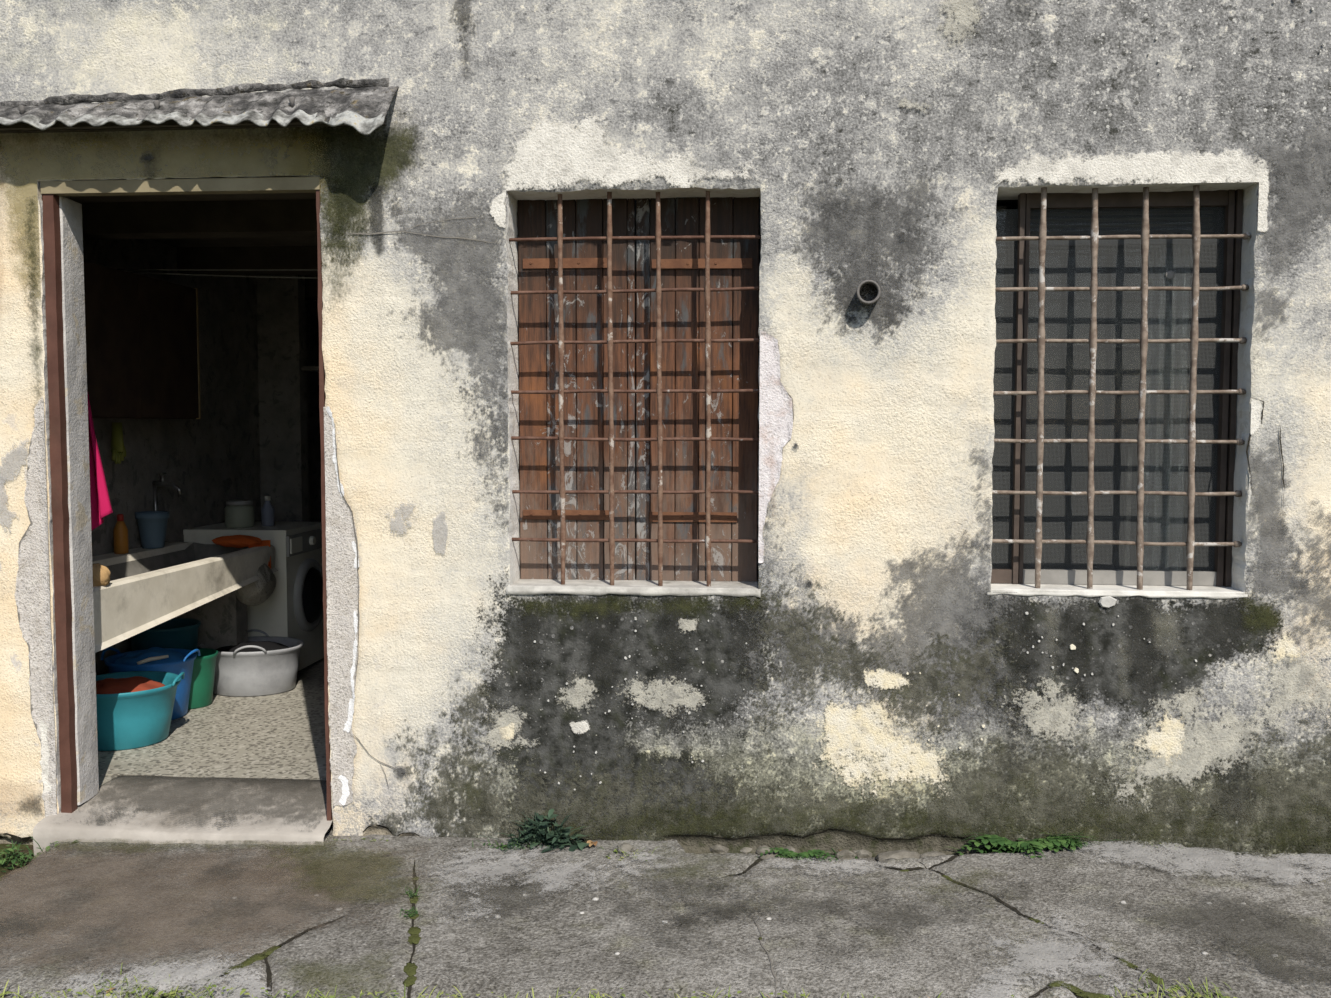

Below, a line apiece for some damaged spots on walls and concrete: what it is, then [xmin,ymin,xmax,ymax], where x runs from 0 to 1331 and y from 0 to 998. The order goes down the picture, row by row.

leakage [0,132,354,359]
leakage [370,187,509,529]
flaking render [758,330,799,563]
flaking render [0,397,57,817]
flaking render [323,406,360,806]
flaking render [557,677,597,734]
flaking render [617,676,707,717]
flaking render [678,618,697,633]
leakage [372,440,1331,917]
flaking render [812,669,950,798]
leakage [0,844,403,998]
leakage [968,913,1150,998]